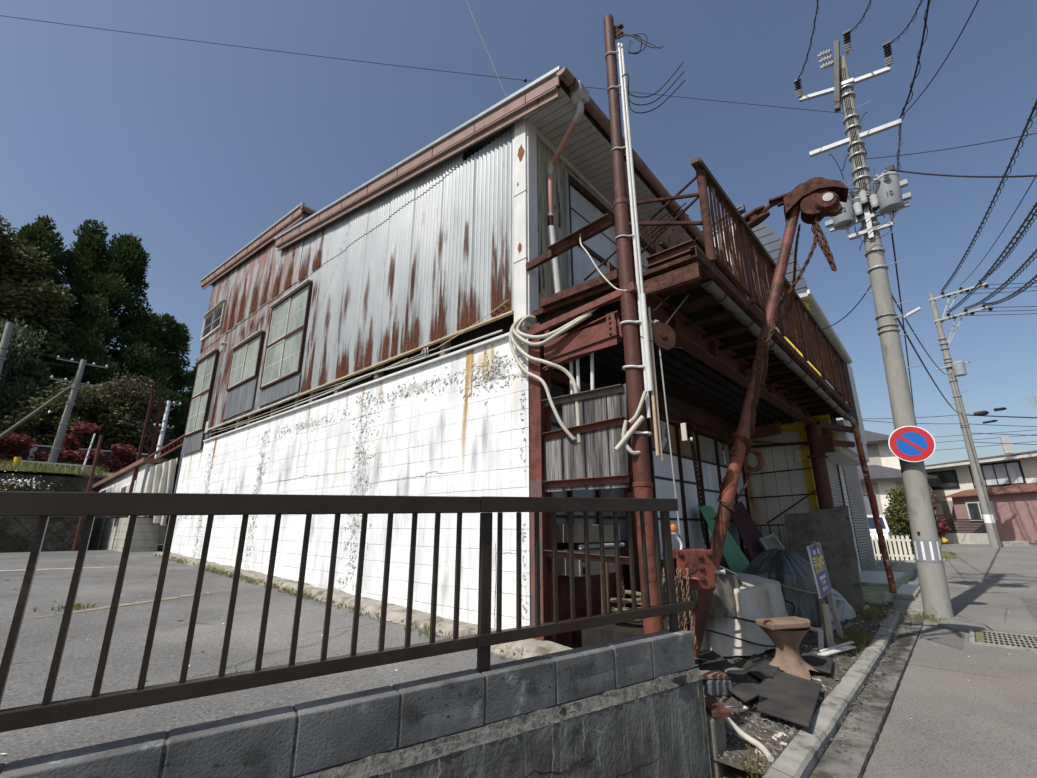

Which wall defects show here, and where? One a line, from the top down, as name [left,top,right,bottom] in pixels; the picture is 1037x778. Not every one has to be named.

corrosion [220,226,522,392]
corrosion [188,349,232,474]
corrosion [462,350,473,448]
leakage [479,344,493,383]
crack [525,726,657,778]